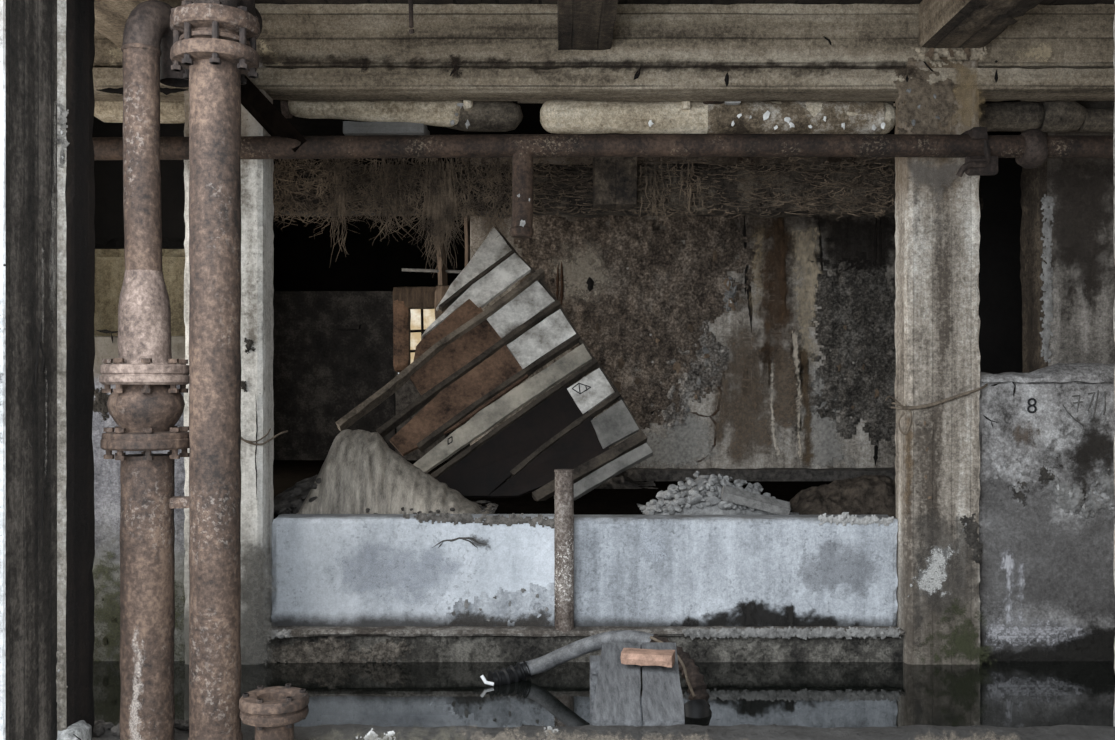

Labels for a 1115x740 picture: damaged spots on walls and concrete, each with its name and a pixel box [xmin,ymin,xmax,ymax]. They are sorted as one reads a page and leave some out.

peeling [514,215,762,430]
rust [755,217,813,466]
water stain [1013,425,1040,444]
water stain [1044,417,1114,507]
water stain [682,601,901,640]
water stain [908,544,960,628]